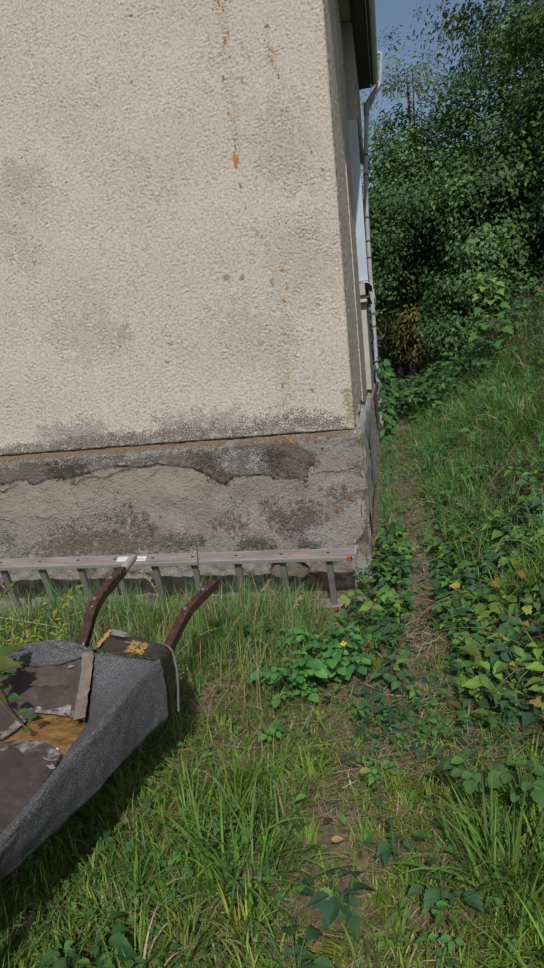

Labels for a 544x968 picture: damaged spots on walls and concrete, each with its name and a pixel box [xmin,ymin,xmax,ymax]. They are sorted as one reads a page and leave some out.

corrosion [212,0,244,169]
crack [0,390,369,497]
leakage [0,387,375,559]